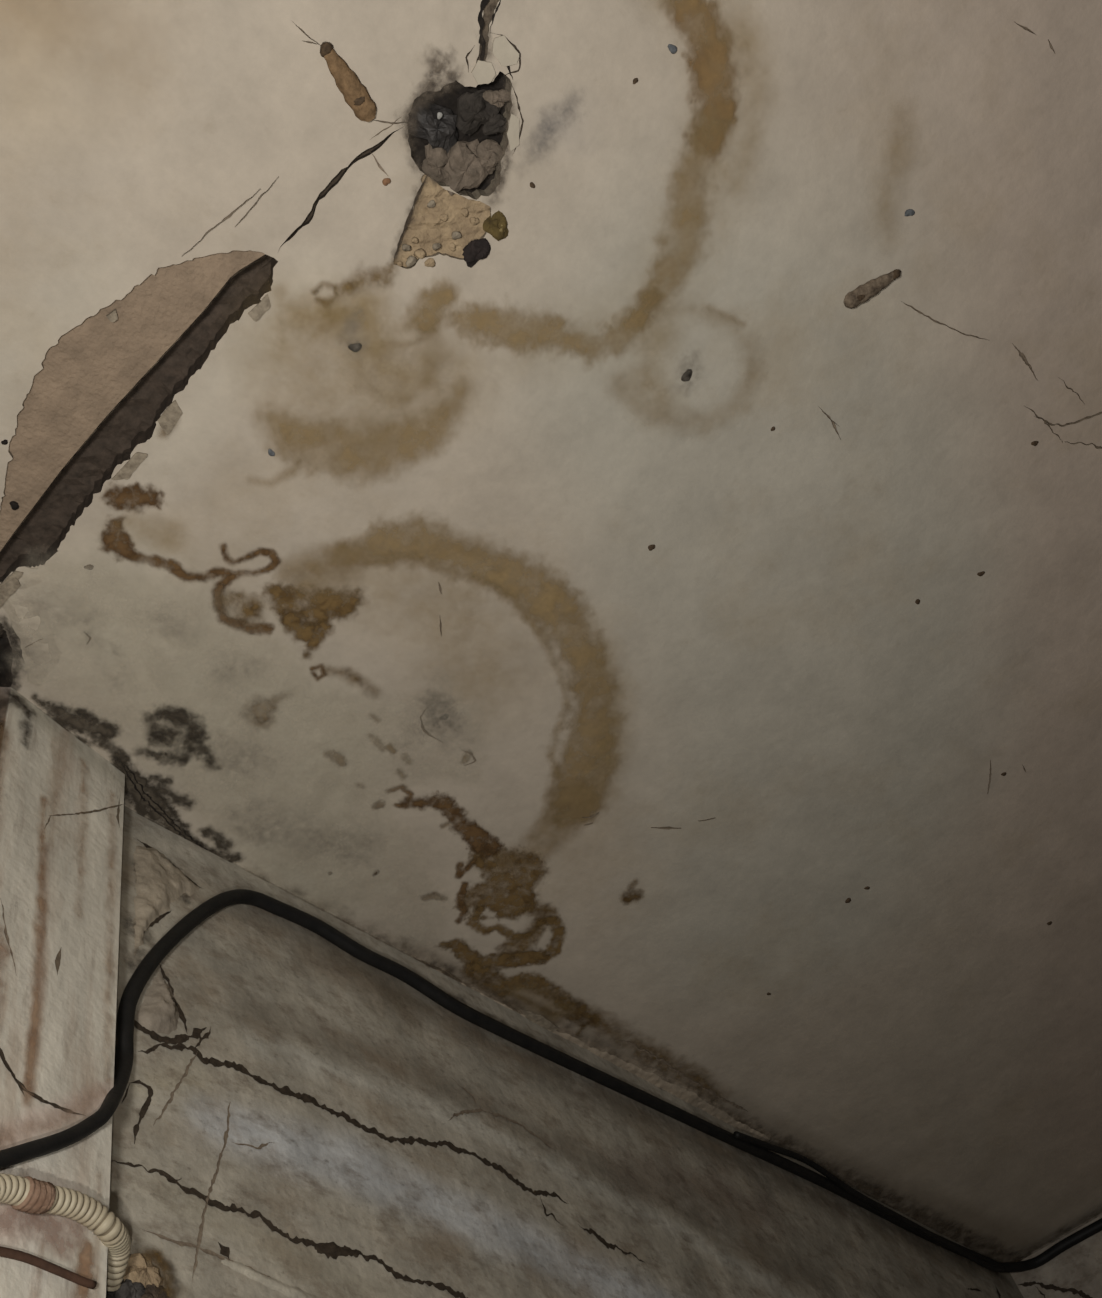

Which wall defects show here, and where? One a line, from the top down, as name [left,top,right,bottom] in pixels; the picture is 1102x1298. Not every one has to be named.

crack [279,117,403,249]
hole [393,0,524,269]
damp [670,0,736,228]
spalling [0,250,267,551]
damp [411,258,685,354]
crack [901,301,1102,449]
spalling [0,617,33,740]
damp [308,520,616,832]
mould [32,695,241,863]
crack [0,1048,83,1115]
crack [111,1026,646,1298]
hole [106,1251,175,1298]